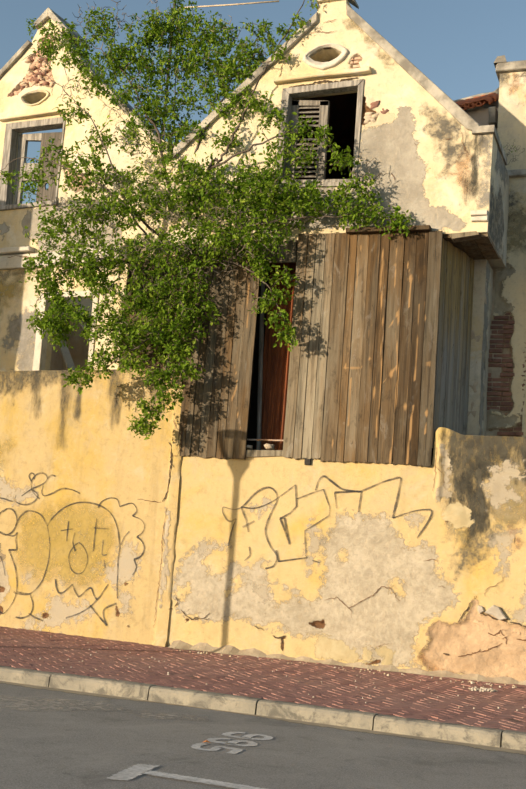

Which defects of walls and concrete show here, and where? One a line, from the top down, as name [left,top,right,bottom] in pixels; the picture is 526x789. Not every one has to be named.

flaking render [7,34,55,97]
flaking render [348,53,362,69]
peeling [251,97,467,231]
damp [423,109,526,260]
flaking render [487,255,526,437]
damp [0,370,81,428]
damp [109,369,120,420]
damp [439,262,526,573]
peeling [480,459,526,515]
peeling [89,541,142,616]
peeling [158,507,526,682]
crack [326,585,400,610]